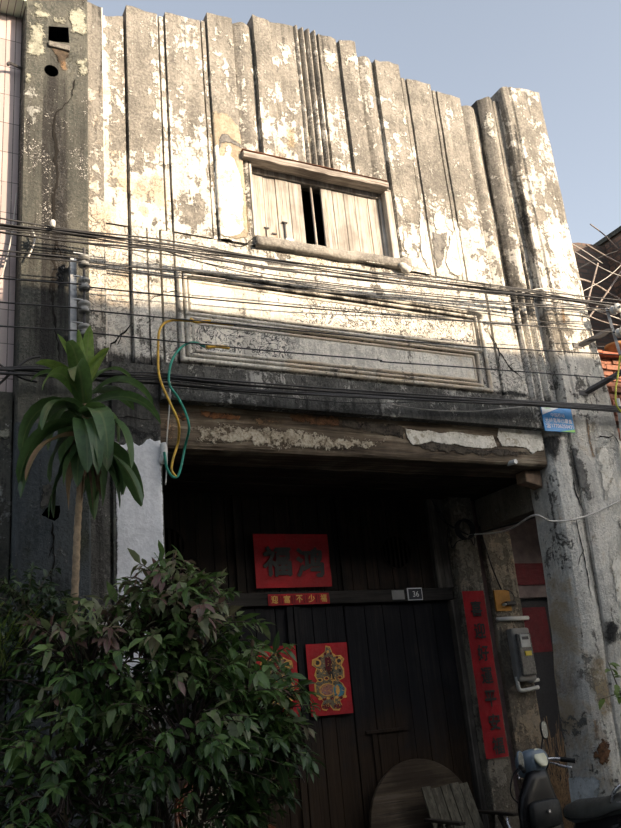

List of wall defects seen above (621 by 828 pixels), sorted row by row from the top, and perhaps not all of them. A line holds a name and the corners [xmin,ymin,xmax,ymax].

flaking render [27,3,89,76]
crack [48,80,75,362]
flaking render [171,111,251,239]
peeling [402,212,465,275]
water stain [498,237,519,342]
water stain [517,175,533,289]
crack [487,329,522,378]
flaking render [177,410,544,457]
crack [47,522,55,584]
crack [573,479,591,594]